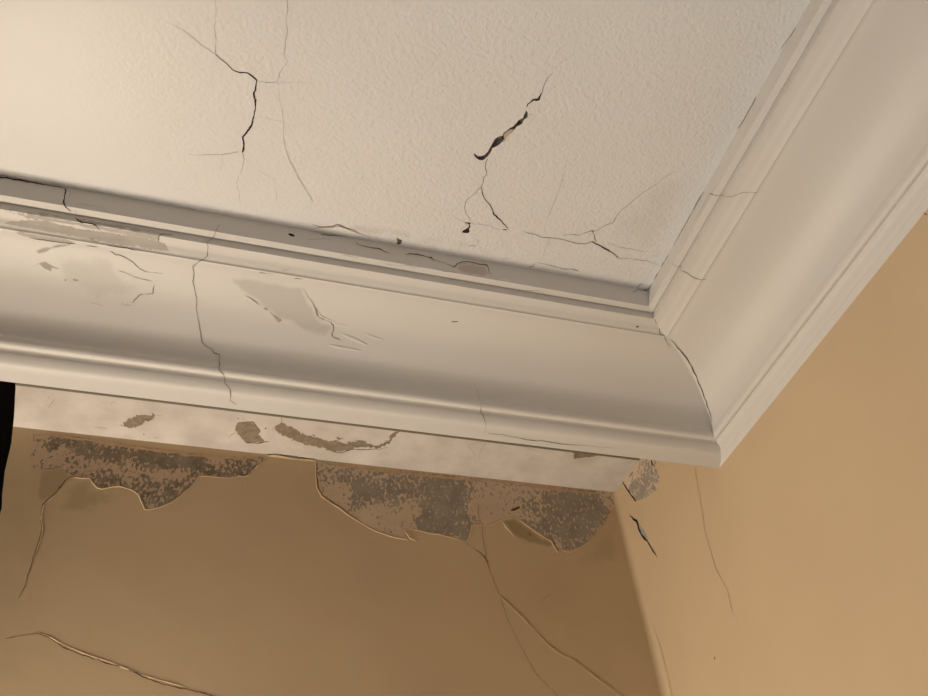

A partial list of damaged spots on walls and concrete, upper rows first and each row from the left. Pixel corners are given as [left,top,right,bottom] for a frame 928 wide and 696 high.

crack [170,2,311,199]
crack [0,172,100,230]
peeling [5,209,170,251]
crack [308,56,757,293]
crack [192,224,234,403]
crack [653,317,712,421]
spalling [121,413,163,435]
peeling [19,418,615,597]
spalling [622,459,660,502]
peeling [630,516,657,557]
crack [6,631,212,696]
crack [468,530,625,696]